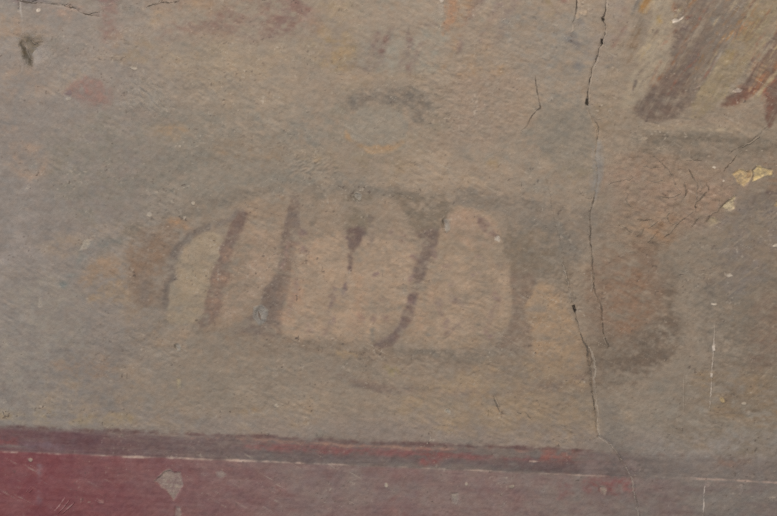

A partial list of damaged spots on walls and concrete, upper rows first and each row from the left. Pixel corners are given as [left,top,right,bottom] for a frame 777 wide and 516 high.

crack [16,0,101,17]
crack [146,0,180,8]
crack [570,0,641,516]
peeling [153,468,184,516]